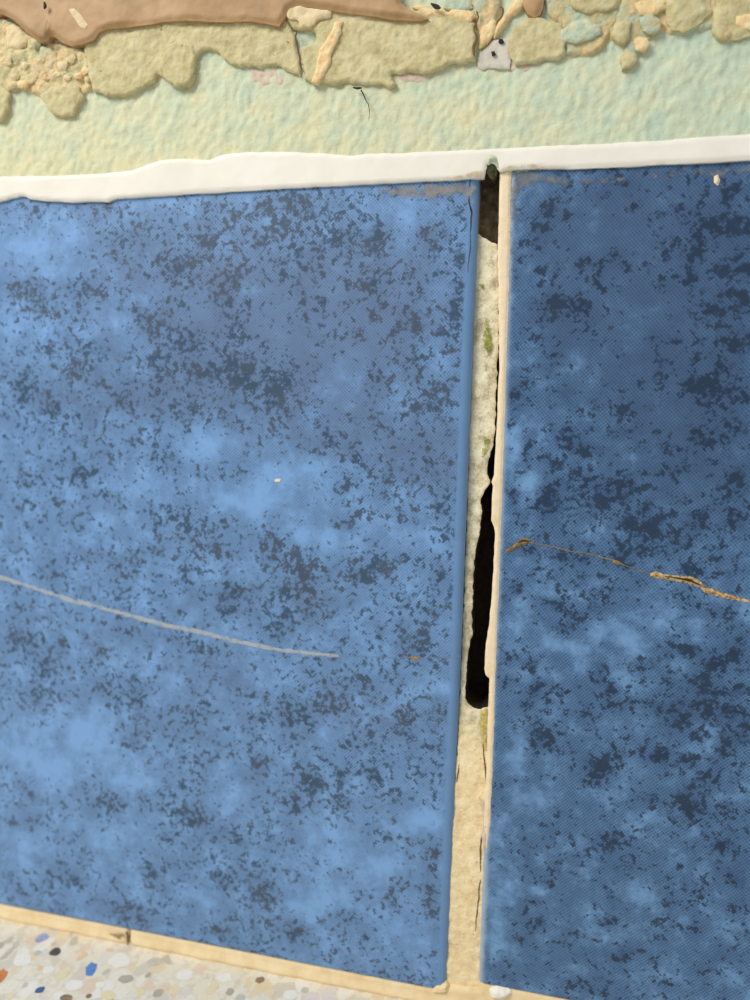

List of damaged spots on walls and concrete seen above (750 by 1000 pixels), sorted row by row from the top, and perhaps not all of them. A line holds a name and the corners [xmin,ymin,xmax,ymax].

spalling [0,0,750,123]
crack [466,180,474,263]
crack [505,538,750,603]
crack [0,575,458,660]